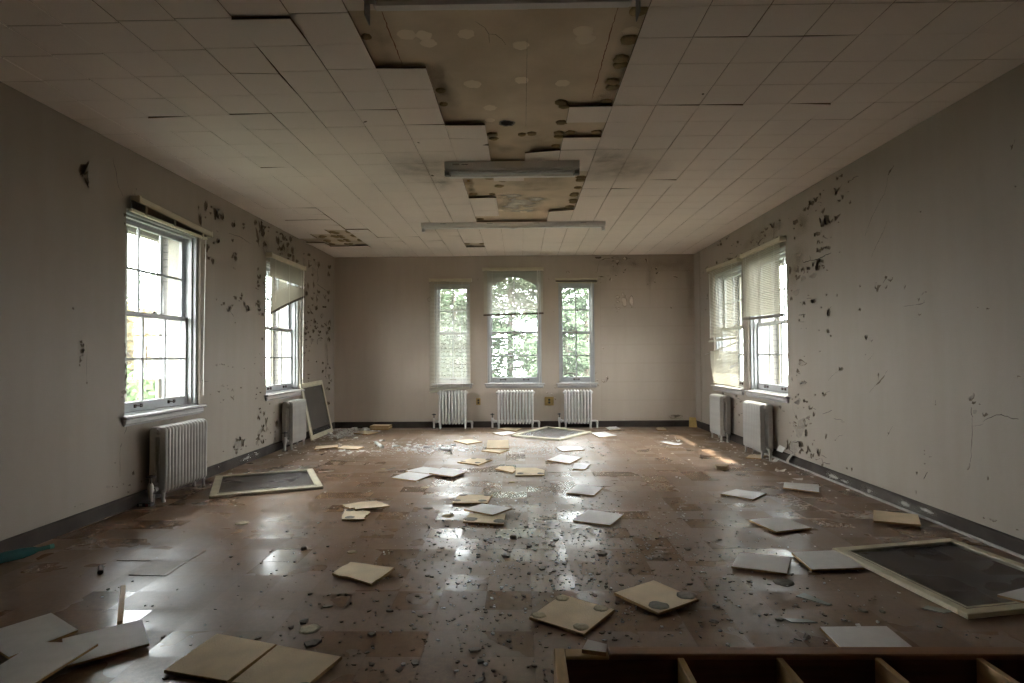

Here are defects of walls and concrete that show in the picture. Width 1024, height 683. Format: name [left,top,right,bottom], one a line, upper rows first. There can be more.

peeling [78,161,90,187]
peeling [198,201,332,405]
peeling [770,356,842,466]
crack [967,393,1017,470]